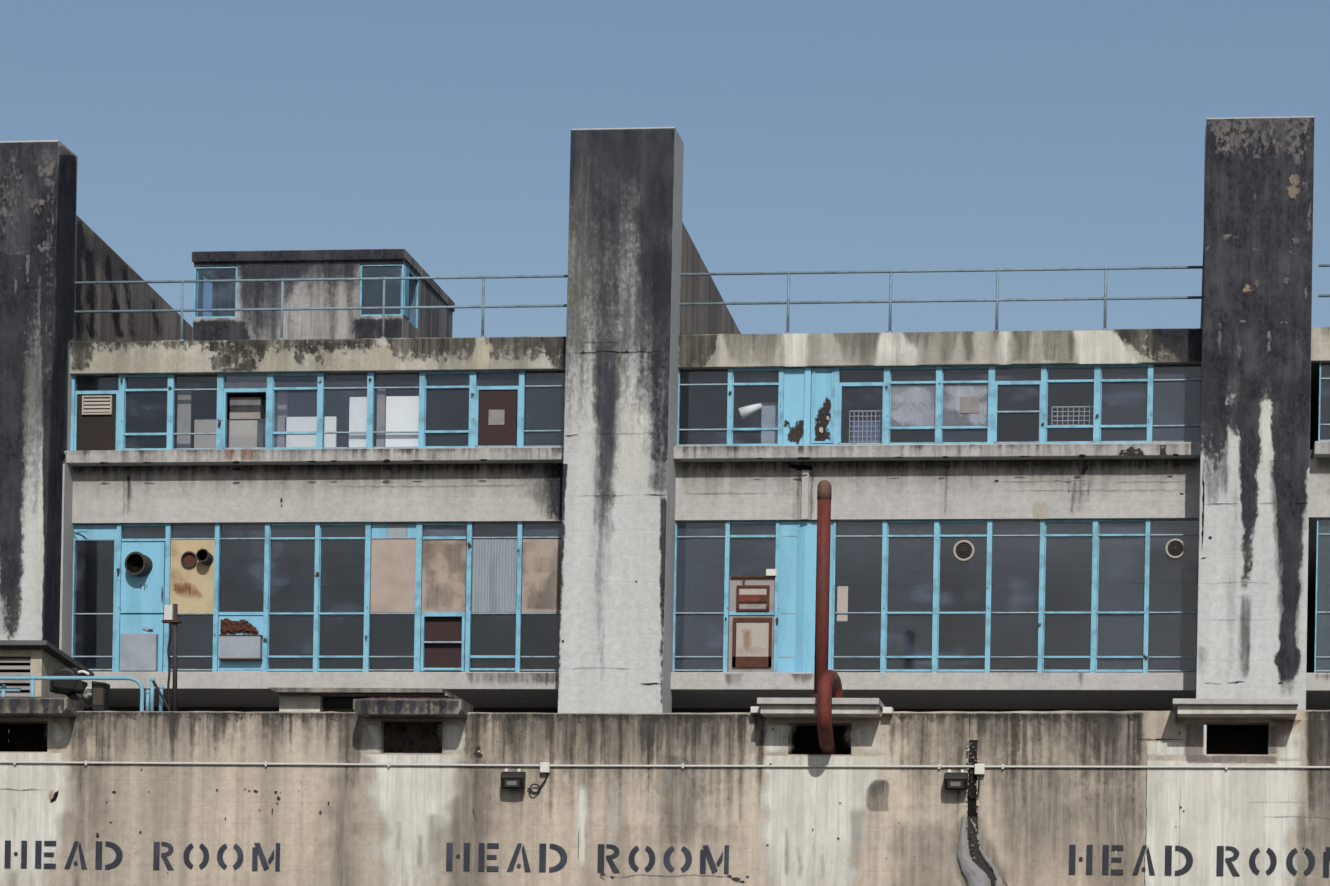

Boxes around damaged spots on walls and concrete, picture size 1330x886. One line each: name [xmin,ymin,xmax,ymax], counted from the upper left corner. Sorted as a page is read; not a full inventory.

peeling [780,397,831,471]
water stain [683,117,1329,681]
crack [965,716,1008,886]
water stain [893,711,1330,886]